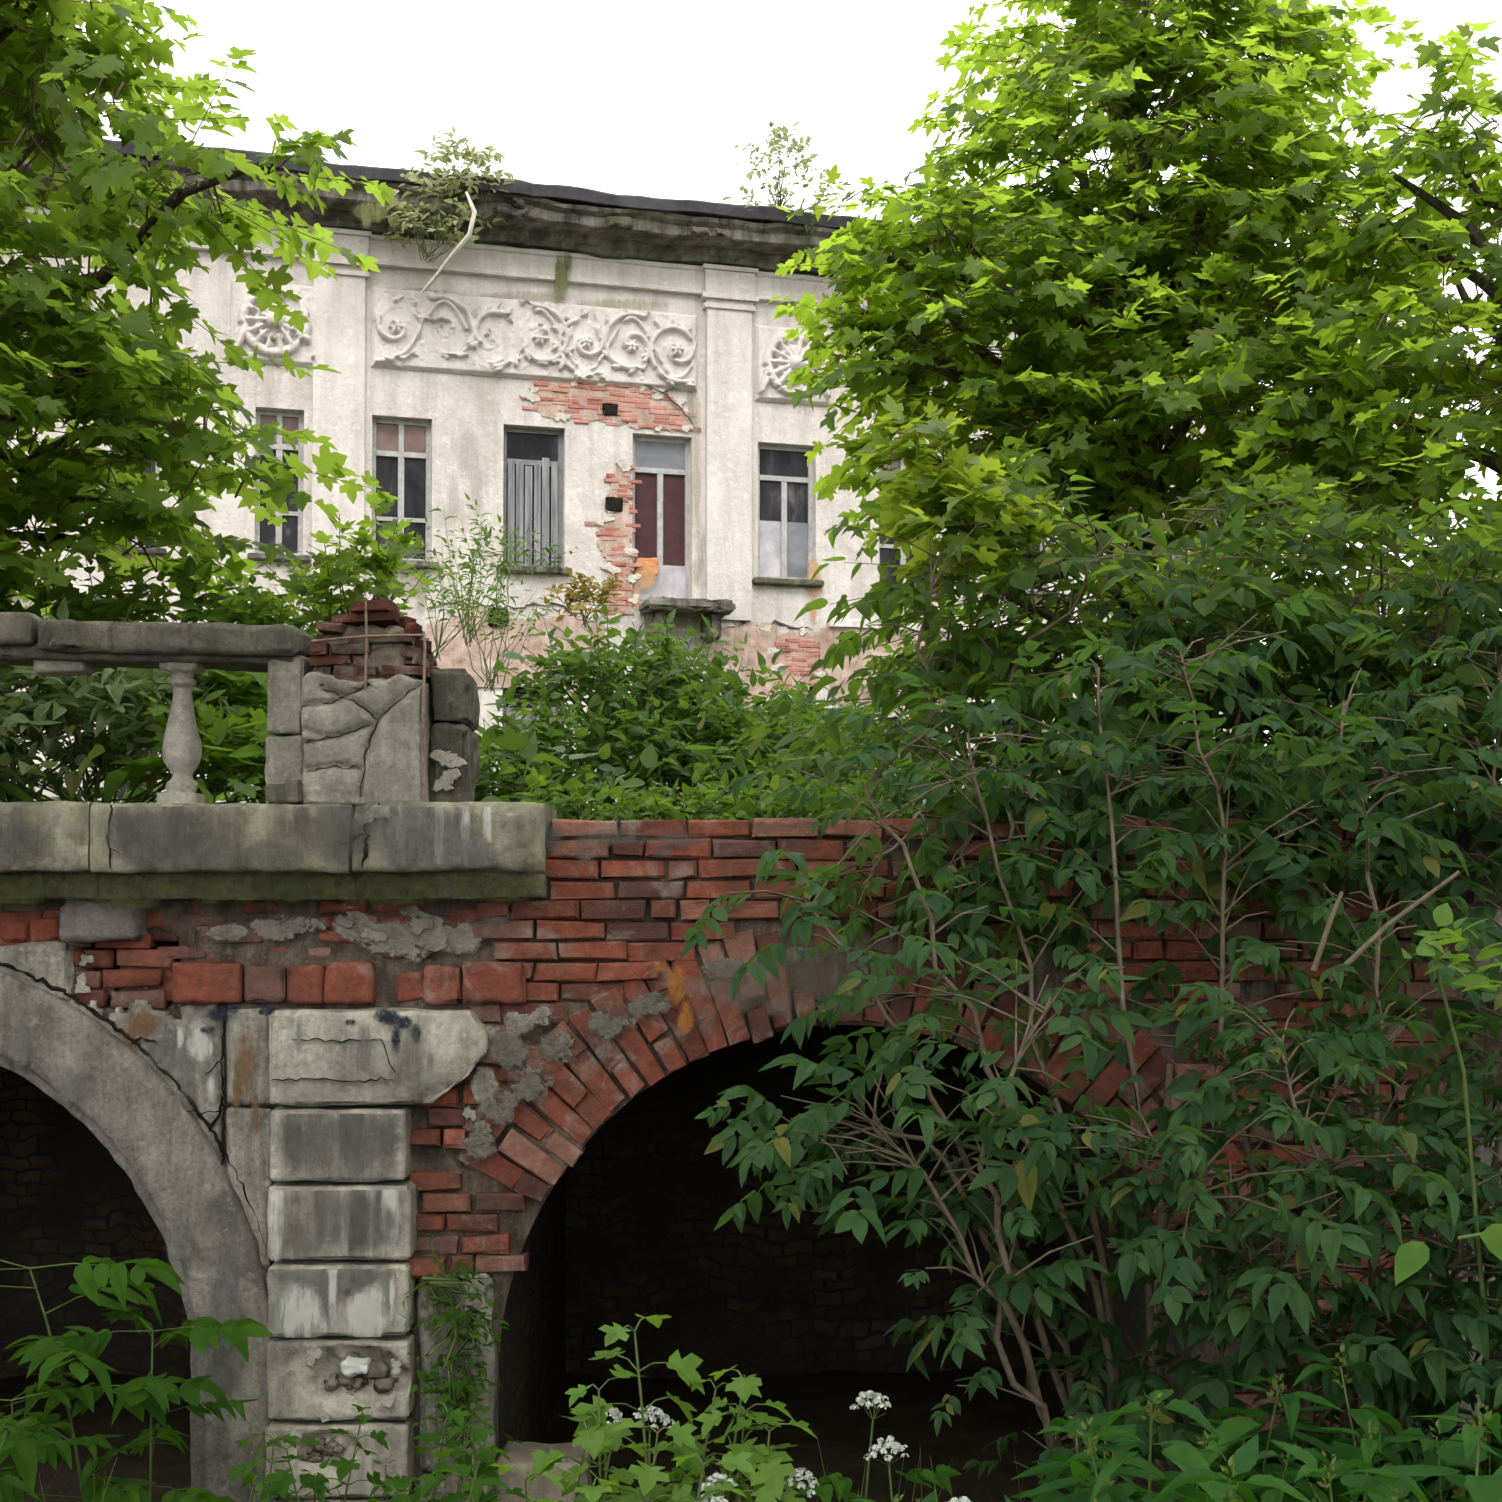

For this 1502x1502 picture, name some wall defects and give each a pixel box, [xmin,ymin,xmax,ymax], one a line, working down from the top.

flaking render [519,380,701,433]
flaking render [425,459,642,692]
crack [303,681,423,868]
peeling [205,903,513,963]
crack [0,962,272,1266]
peeling [462,991,671,1166]
spalling [290,1409,346,1463]
spalling [306,1348,402,1409]